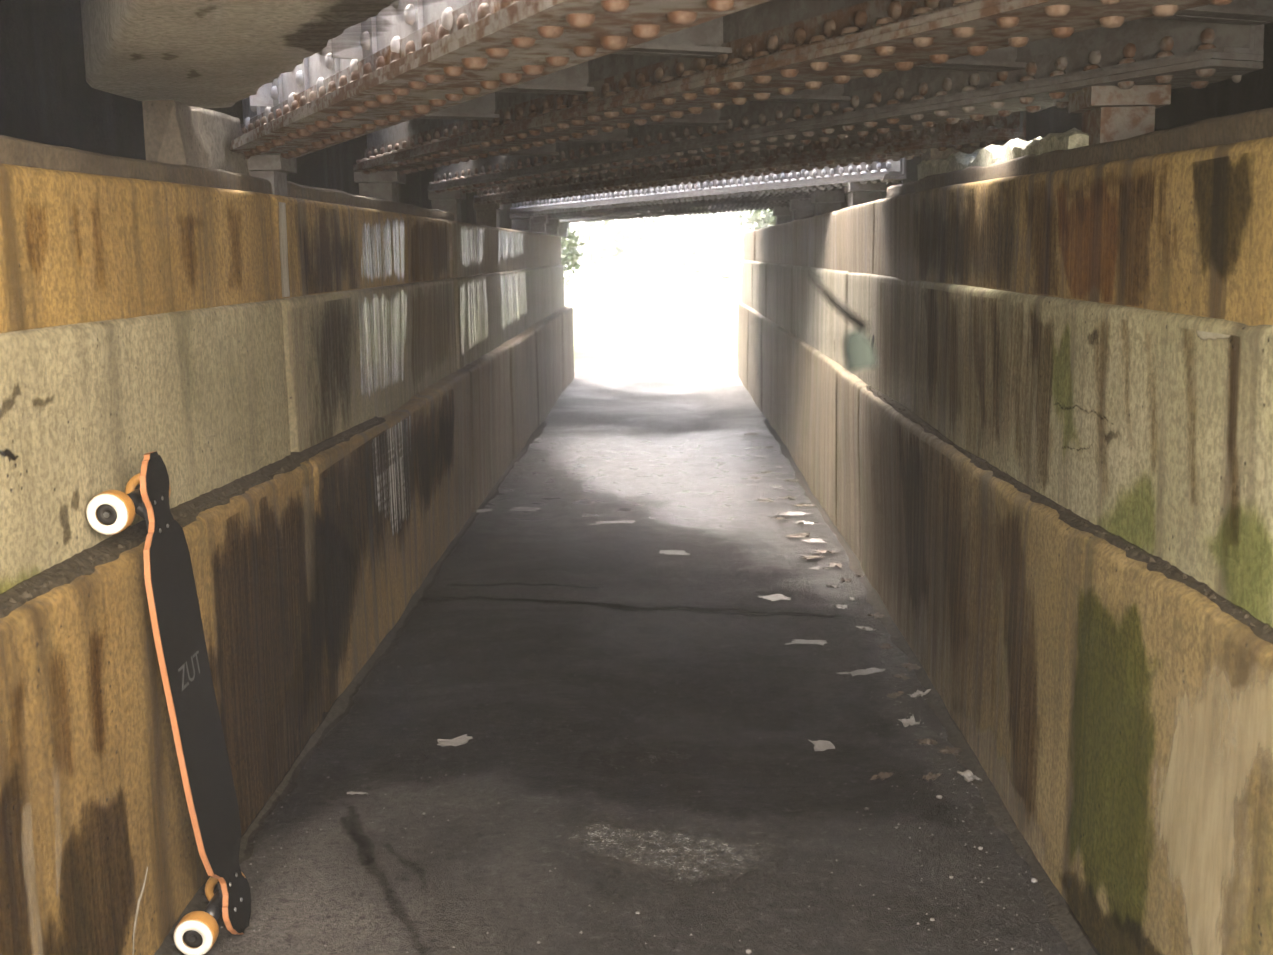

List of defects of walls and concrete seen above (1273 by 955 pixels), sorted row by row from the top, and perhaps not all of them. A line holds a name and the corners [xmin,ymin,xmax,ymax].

leakage [1194,157,1250,274]
leakage [304,212,409,439]
leakage [210,415,453,837]
crack [421,583,835,618]
leakage [50,795,148,955]